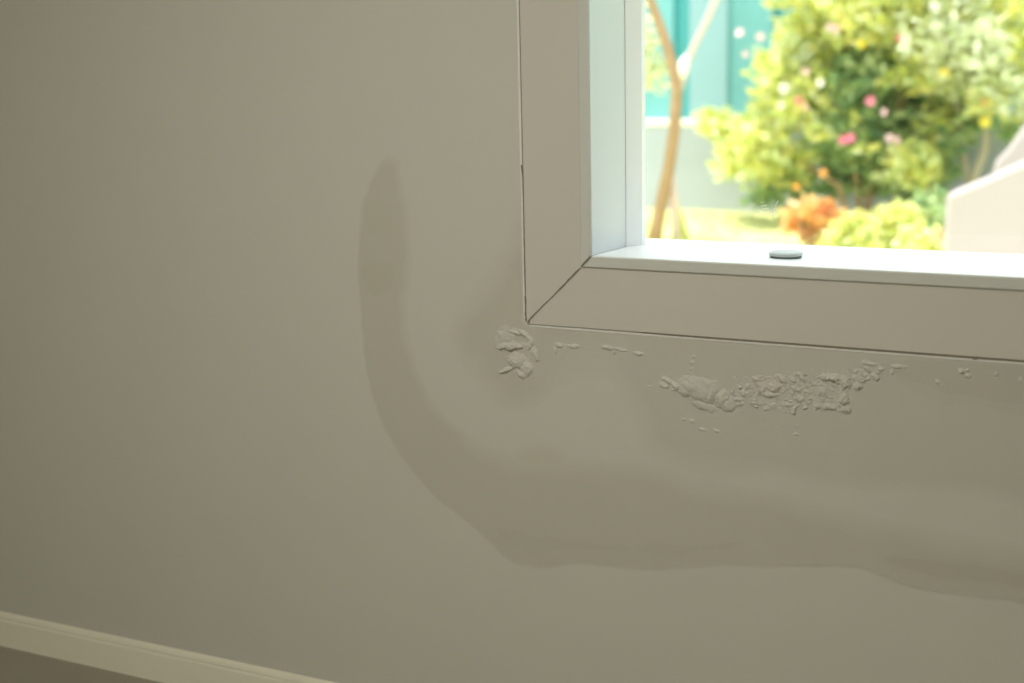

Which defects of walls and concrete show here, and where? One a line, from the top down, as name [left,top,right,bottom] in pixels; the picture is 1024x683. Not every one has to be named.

damp [357,155,1024,607]